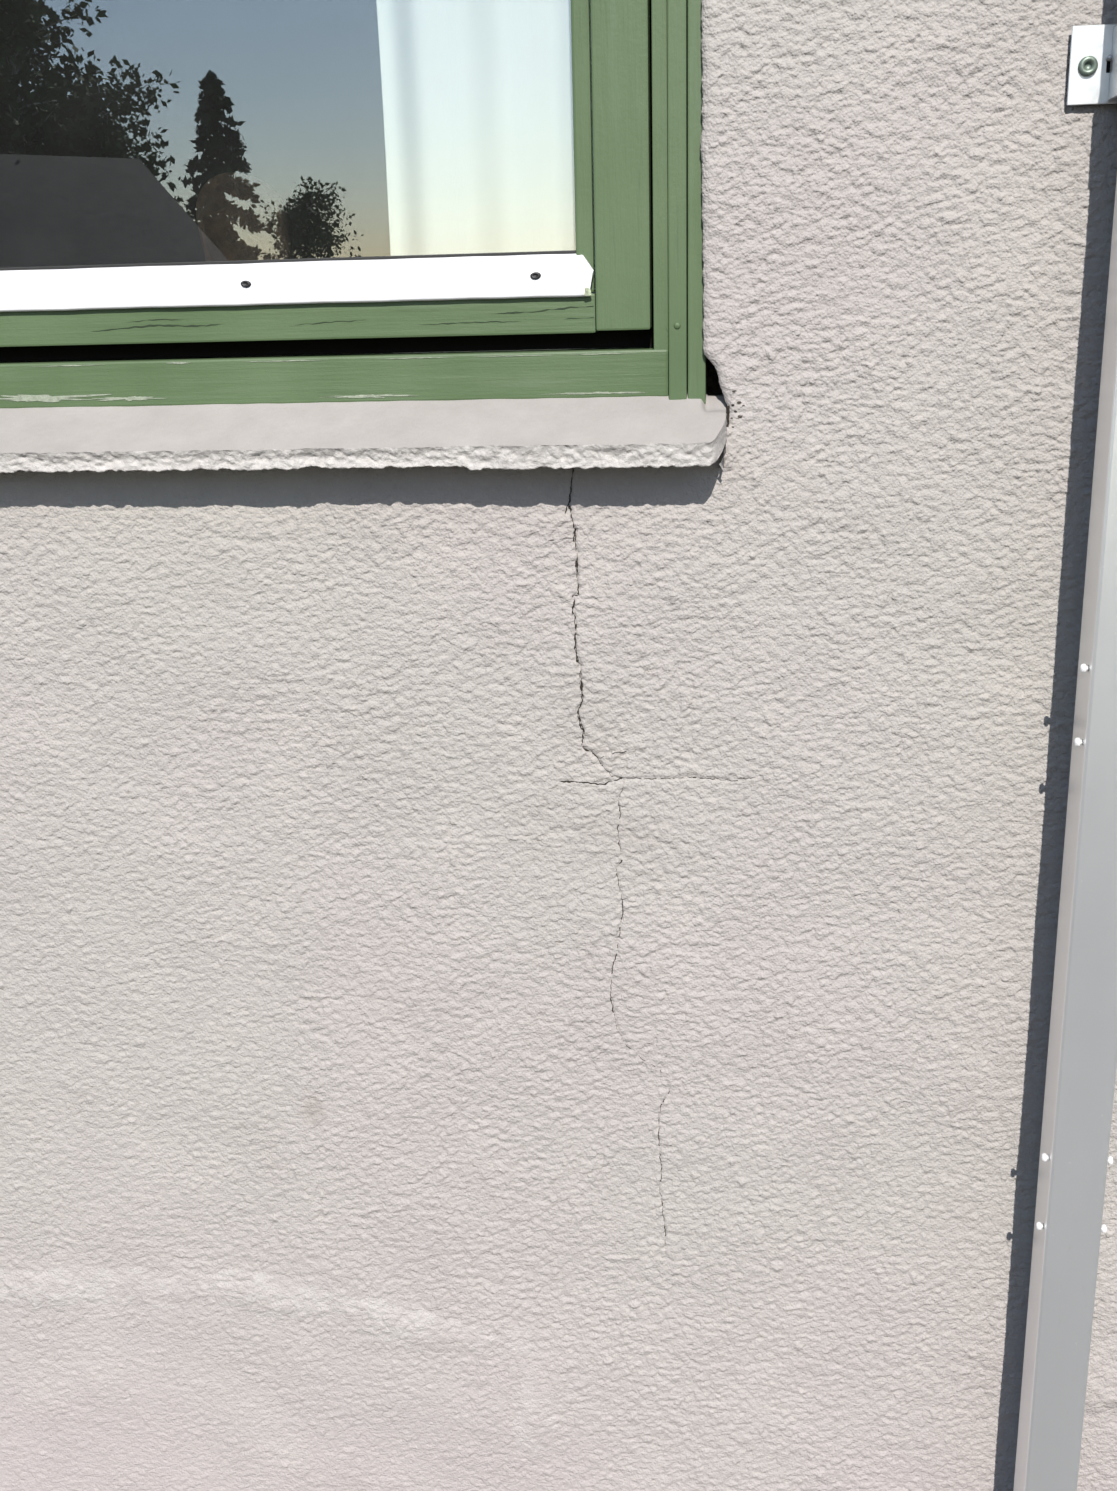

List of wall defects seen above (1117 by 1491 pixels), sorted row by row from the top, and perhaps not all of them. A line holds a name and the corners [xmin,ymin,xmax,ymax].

crack [549,469,754,1244]